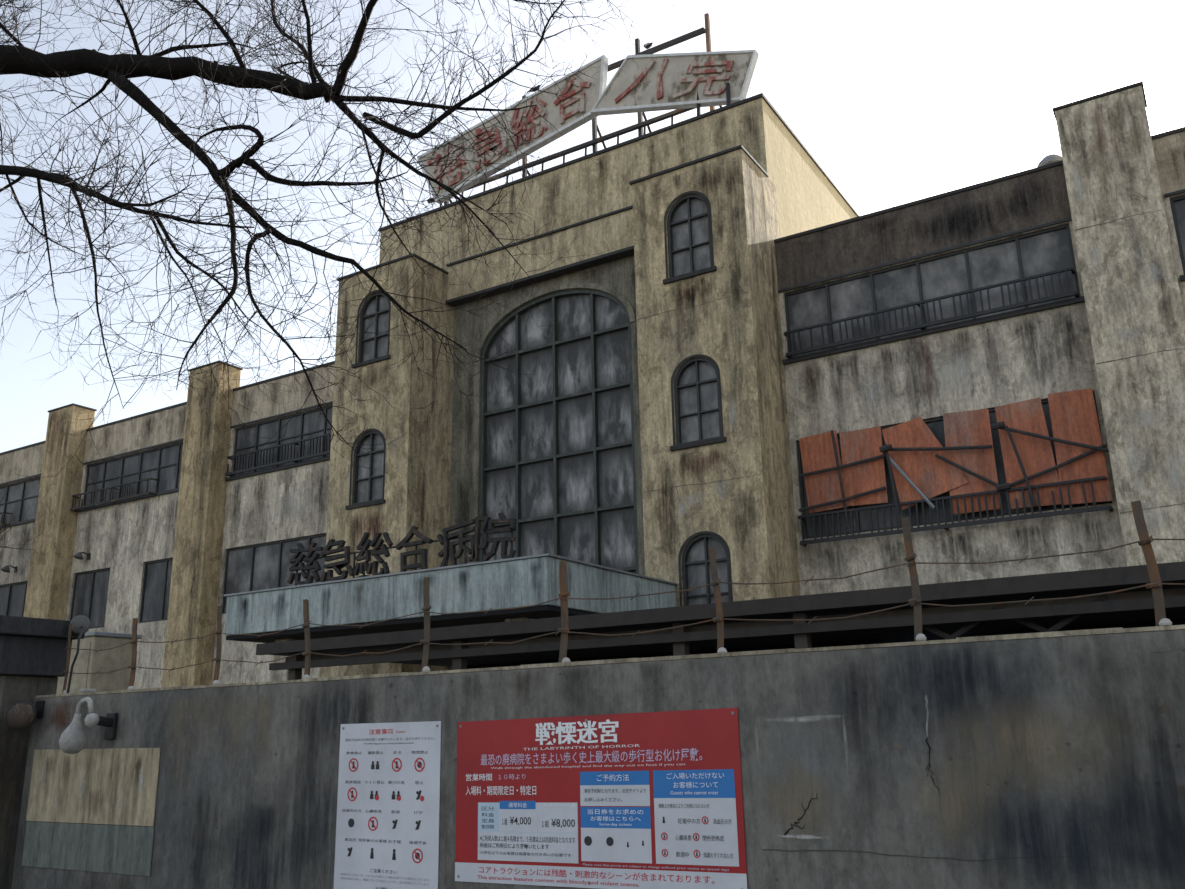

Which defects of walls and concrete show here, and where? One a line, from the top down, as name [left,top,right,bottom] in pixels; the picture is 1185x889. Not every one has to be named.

crack [925,738,940,793]
crack [762,793,1070,861]